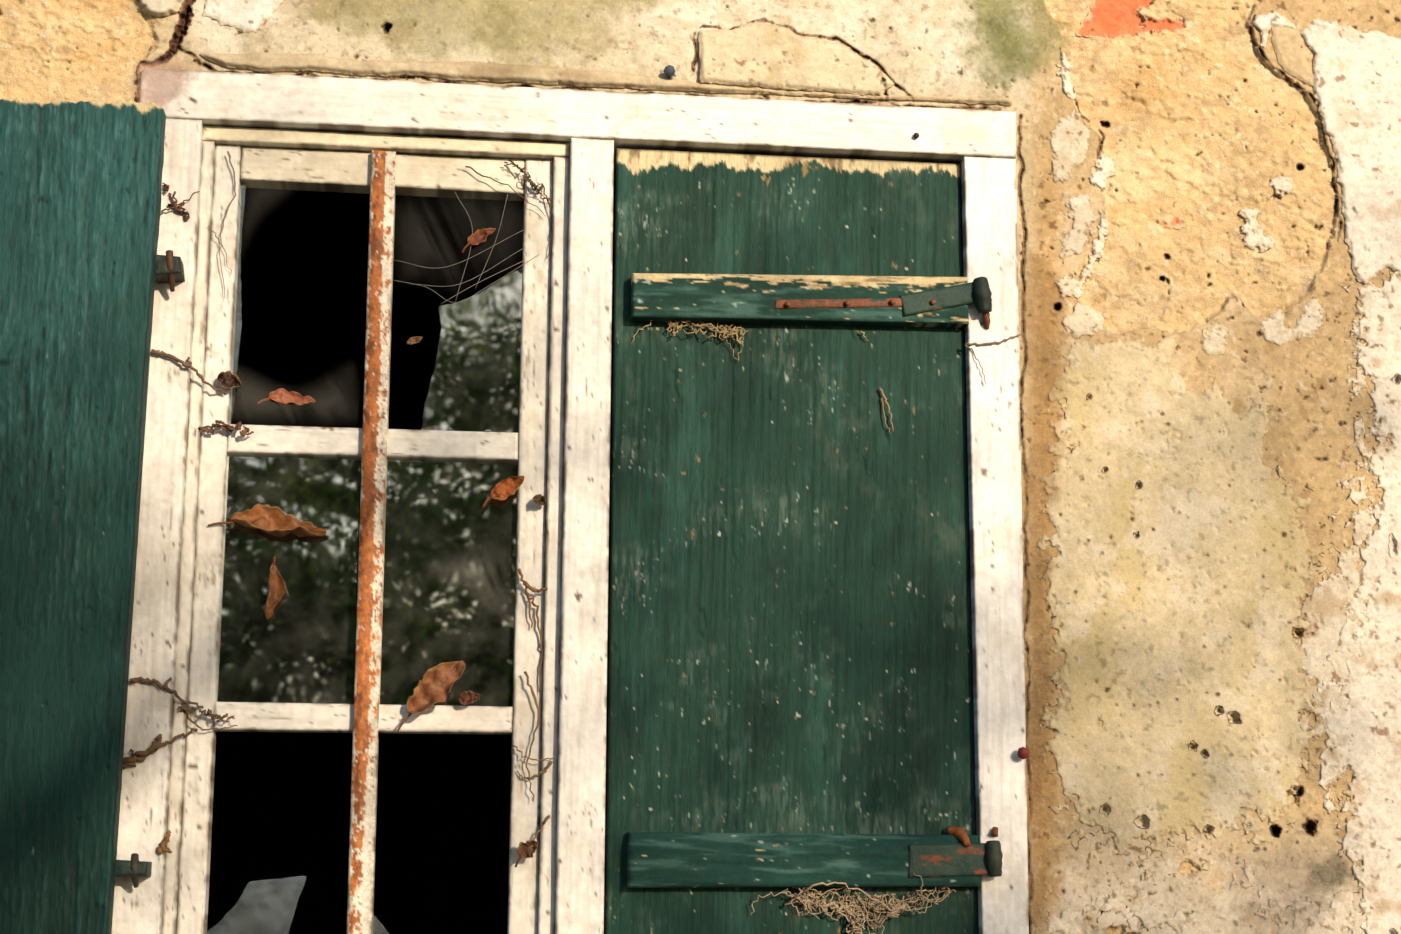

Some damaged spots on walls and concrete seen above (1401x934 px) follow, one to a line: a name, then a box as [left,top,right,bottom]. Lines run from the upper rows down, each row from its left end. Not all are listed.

spalling [0,0,184,104]
peeling [202,0,284,33]
crack [134,0,593,103]
crack [1073,88,1105,159]
crack [1248,15,1342,243]
crack [633,18,1033,934]
peeling [1031,0,1401,934]